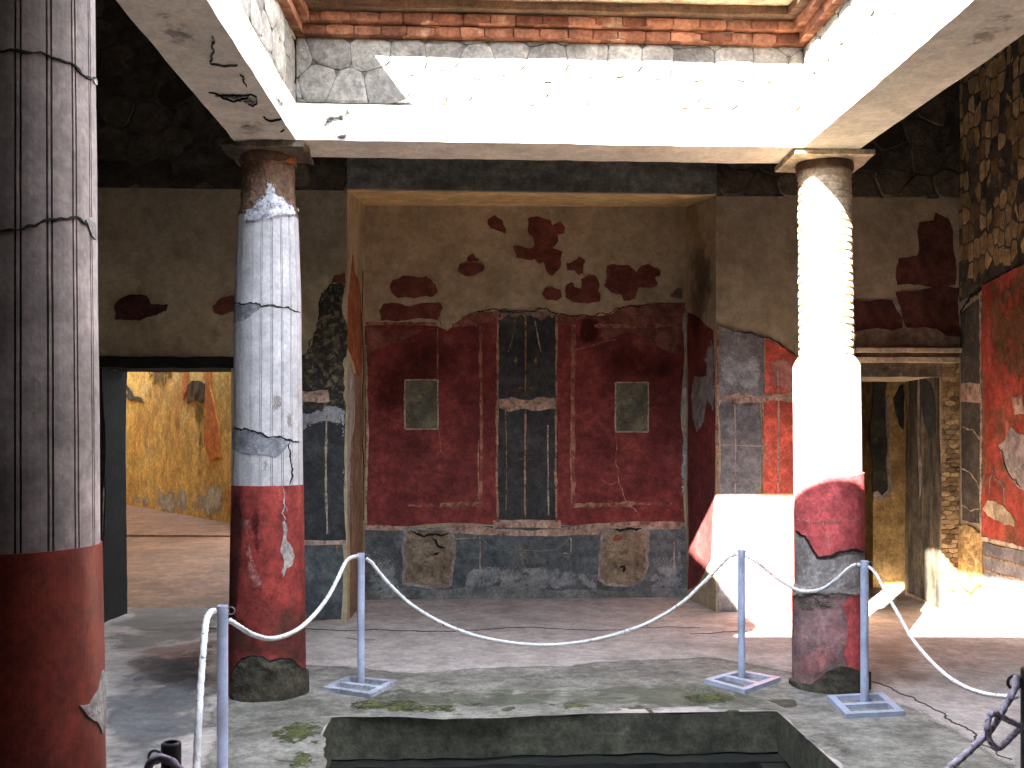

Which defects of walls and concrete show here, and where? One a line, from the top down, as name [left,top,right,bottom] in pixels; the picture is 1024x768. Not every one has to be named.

crack [0,48,98,82]
crack [208,36,284,133]
crack [0,216,88,232]
peeling [853,302,960,349]
crack [233,270,364,521]
spalling [998,427,1024,491]
spalling [983,500,1016,527]
spalling [280,521,295,577]
spalling [79,670,107,734]
spalling [229,655,309,703]